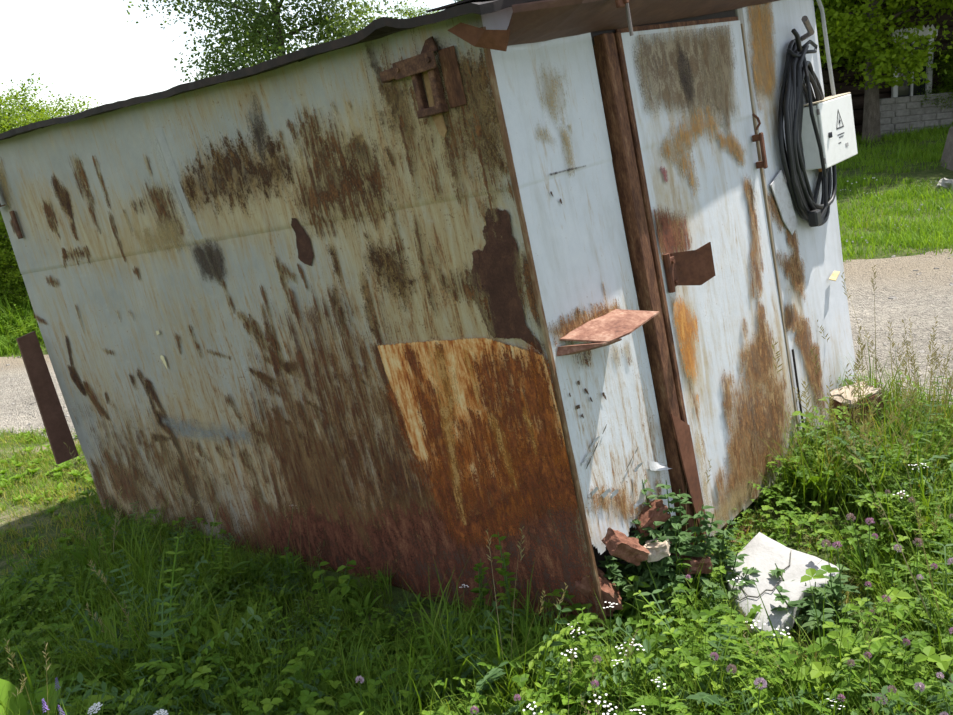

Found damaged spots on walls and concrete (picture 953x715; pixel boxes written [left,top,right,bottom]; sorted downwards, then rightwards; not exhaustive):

corrosion [636,25,746,195]
corrosion [654,207,692,258]
corrosion [41,31,662,648]
corrosion [670,294,700,409]
corrosion [695,177,824,531]